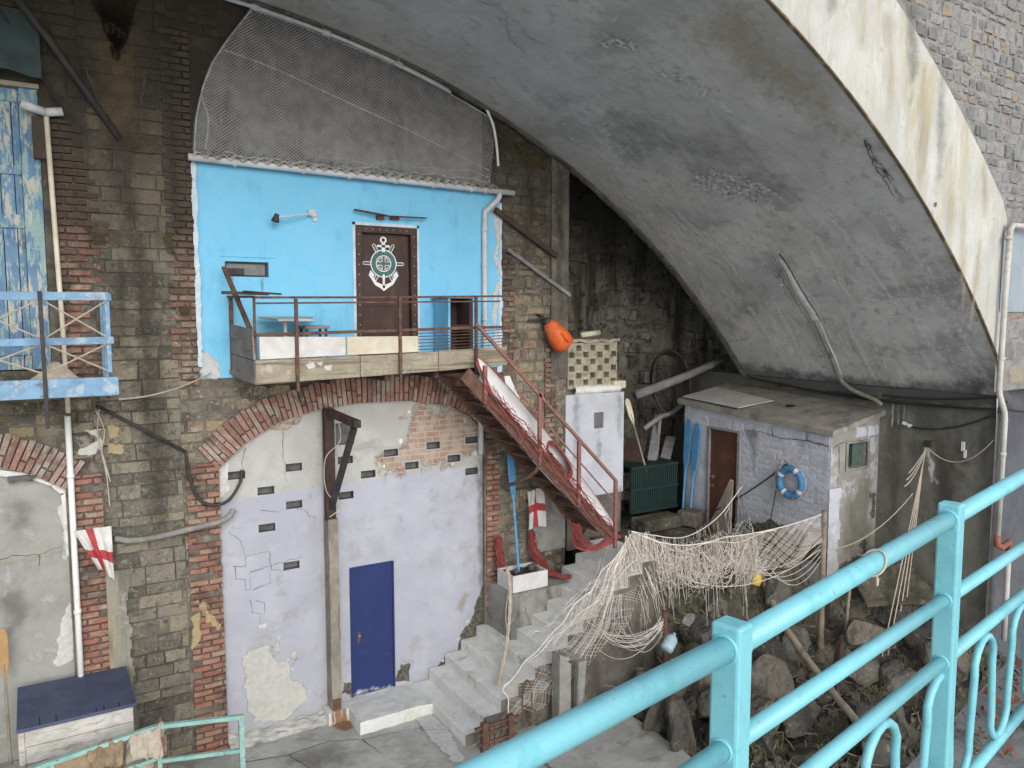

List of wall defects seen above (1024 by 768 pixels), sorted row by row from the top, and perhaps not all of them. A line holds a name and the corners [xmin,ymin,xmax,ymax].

crack [864,140,894,194]
flaking render [191,161,221,379]
flaking render [376,402,478,475]
crack [232,535,299,625]
peeling [52,603,74,667]
peeling [242,623,311,723]